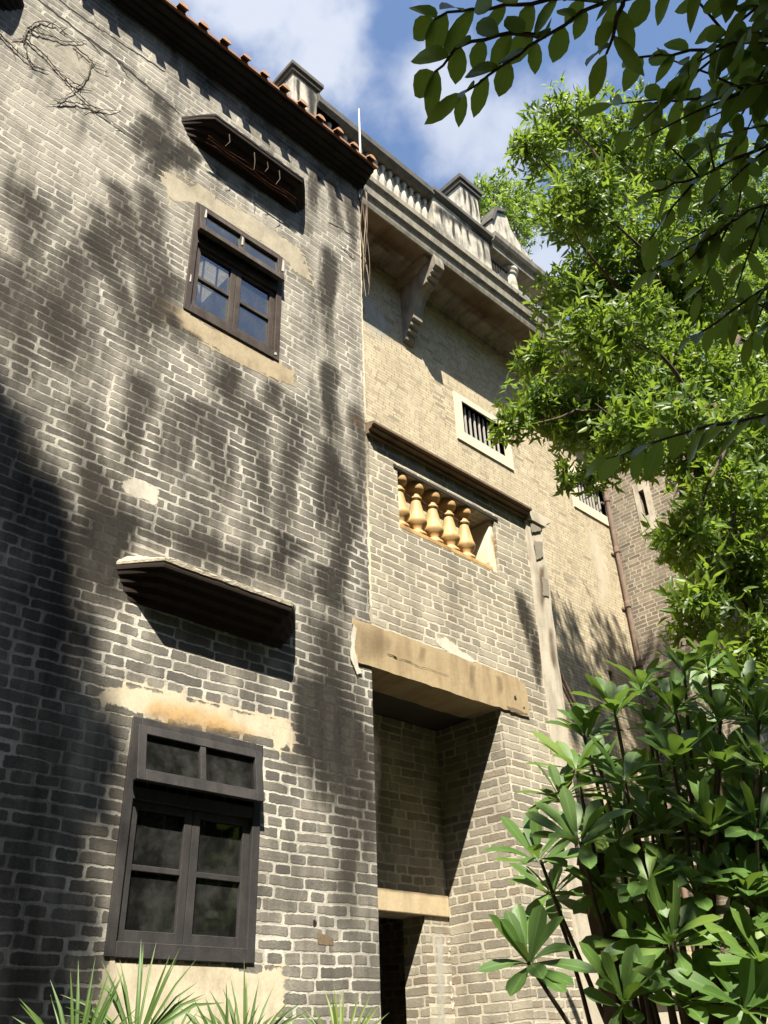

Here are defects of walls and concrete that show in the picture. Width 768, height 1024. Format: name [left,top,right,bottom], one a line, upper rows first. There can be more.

spalling [350,624,363,674]